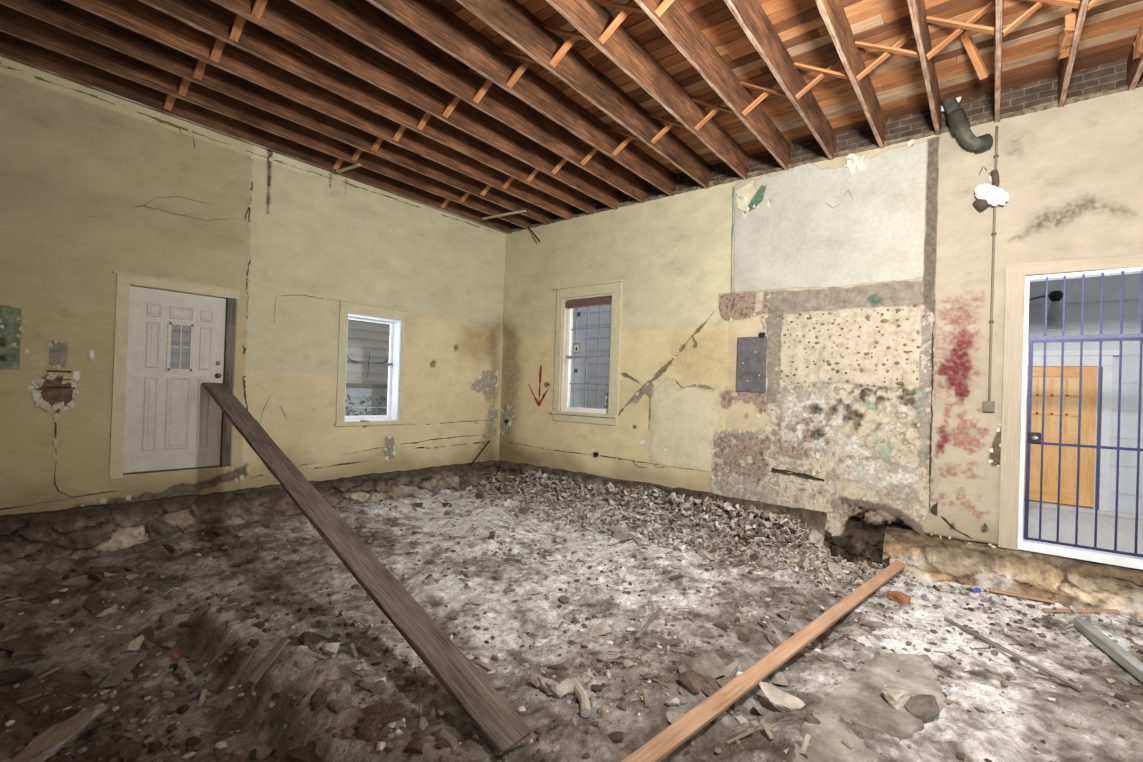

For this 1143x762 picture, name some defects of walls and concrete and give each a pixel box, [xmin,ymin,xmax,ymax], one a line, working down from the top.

crack [0,61,498,422]
spalling [0,305,29,369]
spalling [27,339,84,413]
peeling [471,369,515,438]
crack [618,311,715,422]
spalling [639,139,938,538]
crack [0,409,116,510]